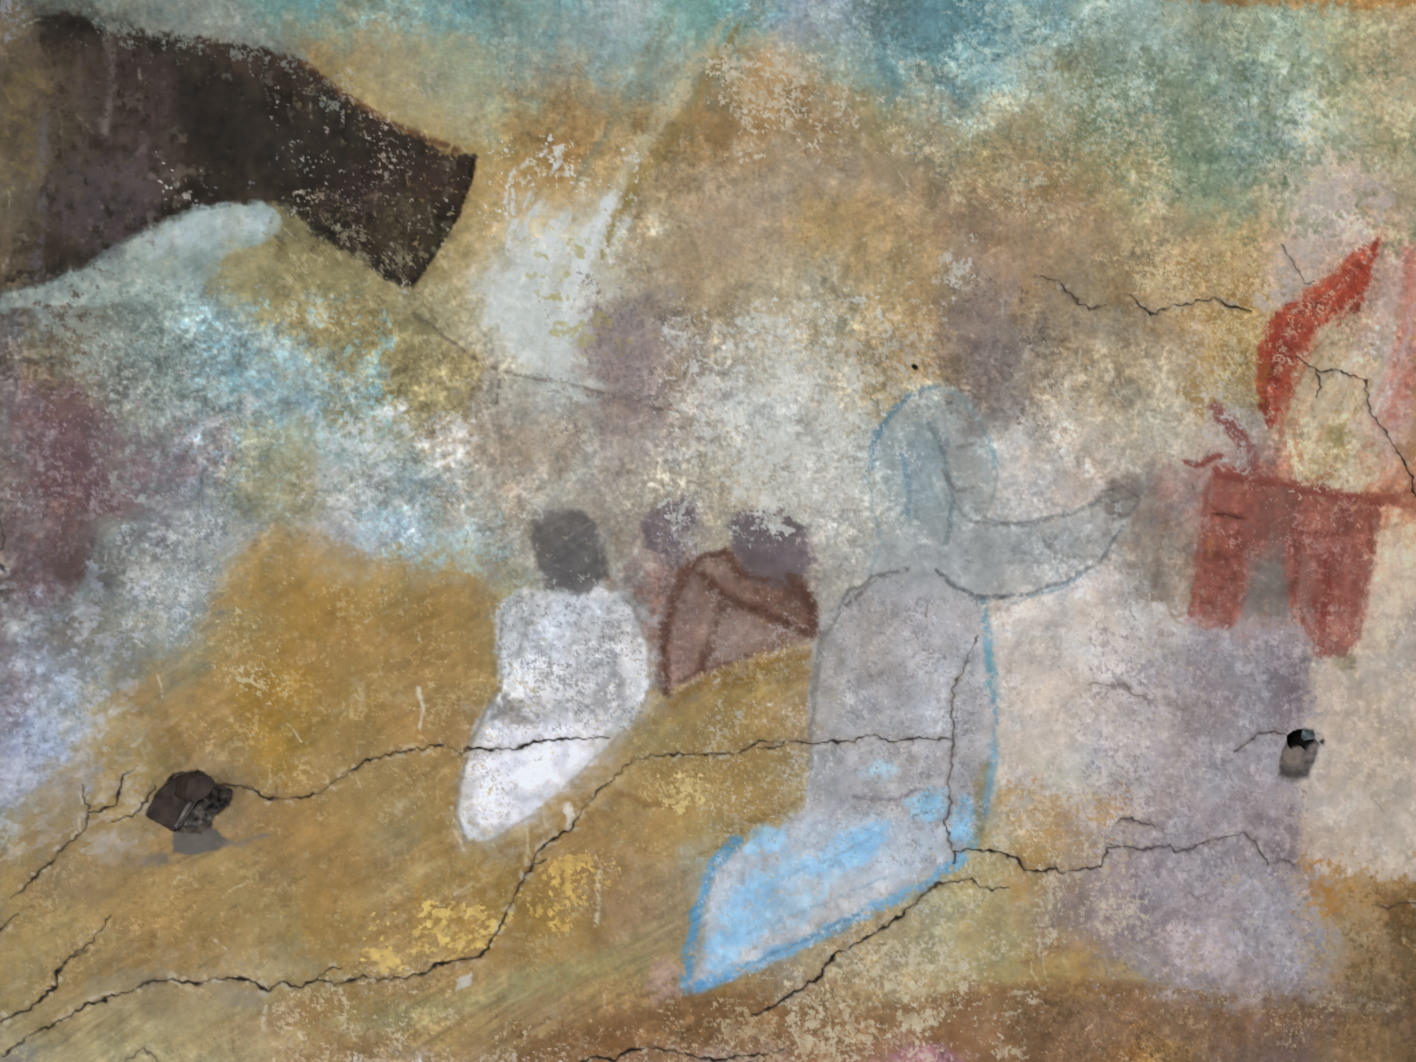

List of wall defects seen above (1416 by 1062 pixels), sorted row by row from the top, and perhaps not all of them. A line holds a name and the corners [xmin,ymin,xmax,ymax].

crack [1280,243,1317,286]
crack [1040,275,1254,317]
crack [1295,354,1416,498]
crack [1234,731,1327,754]
spalling [1287,729,1316,750]
crack [0,636,1296,1062]